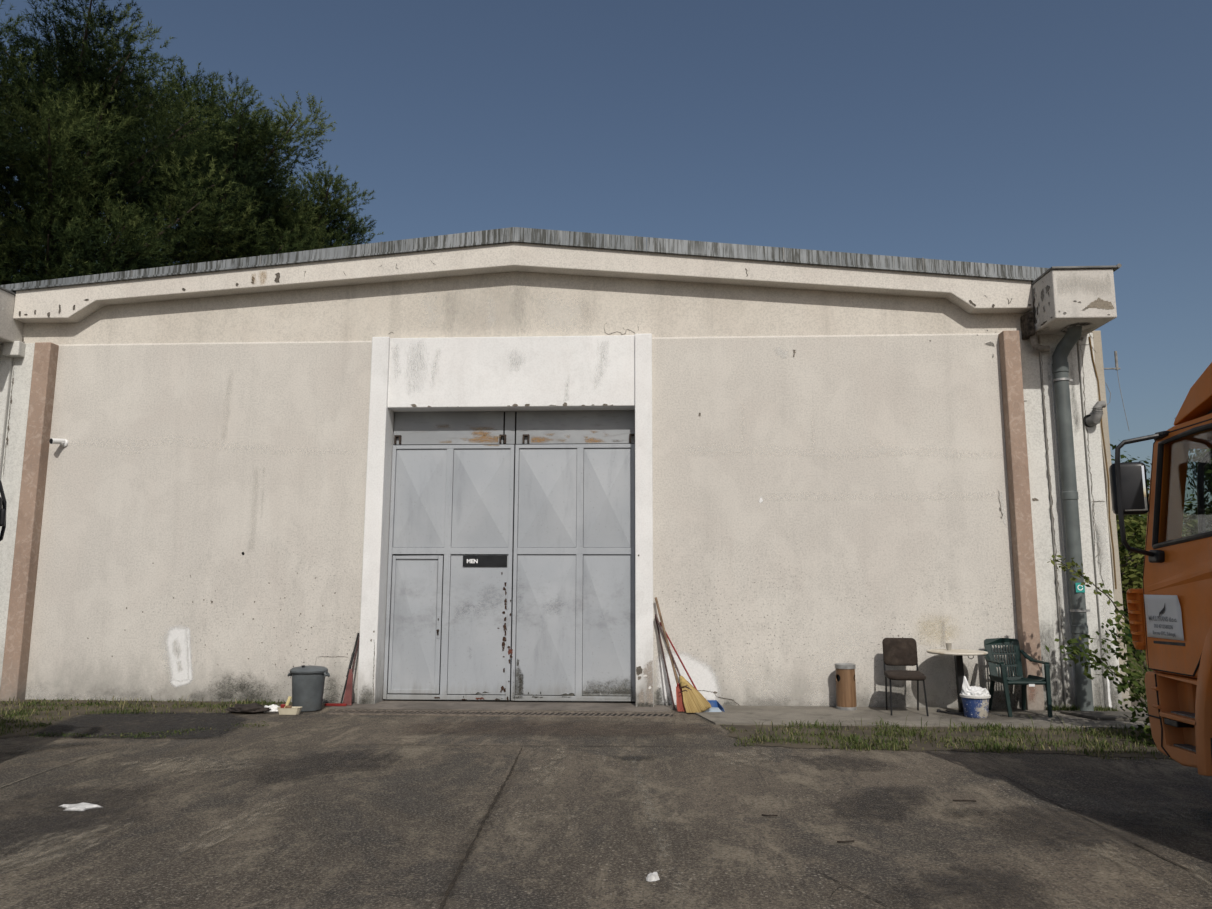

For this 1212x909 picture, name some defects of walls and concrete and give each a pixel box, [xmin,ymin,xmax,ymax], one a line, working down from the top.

peeling [1028,281,1114,340]